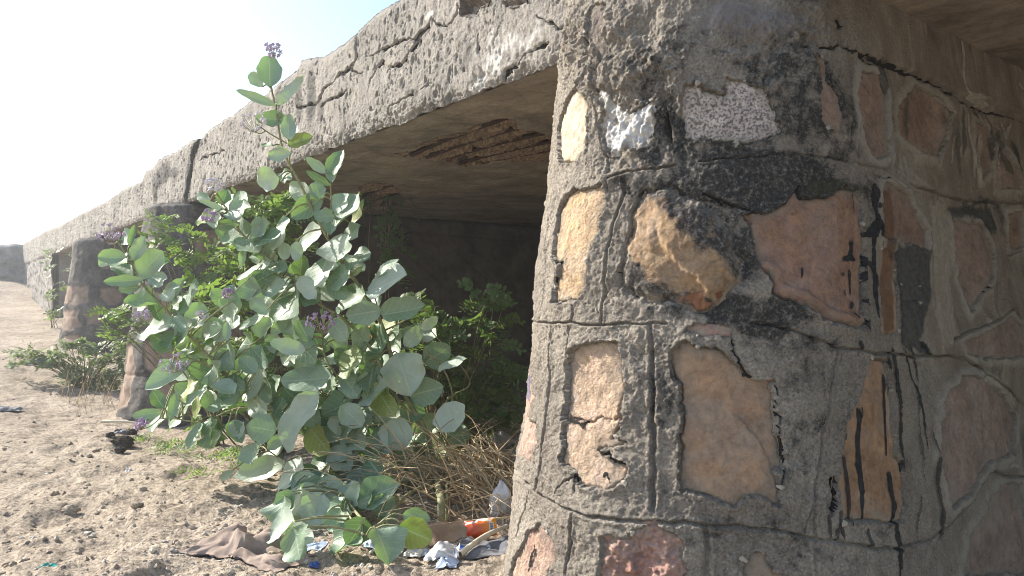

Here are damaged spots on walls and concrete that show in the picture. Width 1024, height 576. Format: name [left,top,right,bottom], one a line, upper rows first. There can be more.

crack [297,13,458,109]
spalling [391,84,658,167]
crack [505,16,595,81]
crack [800,45,1014,154]